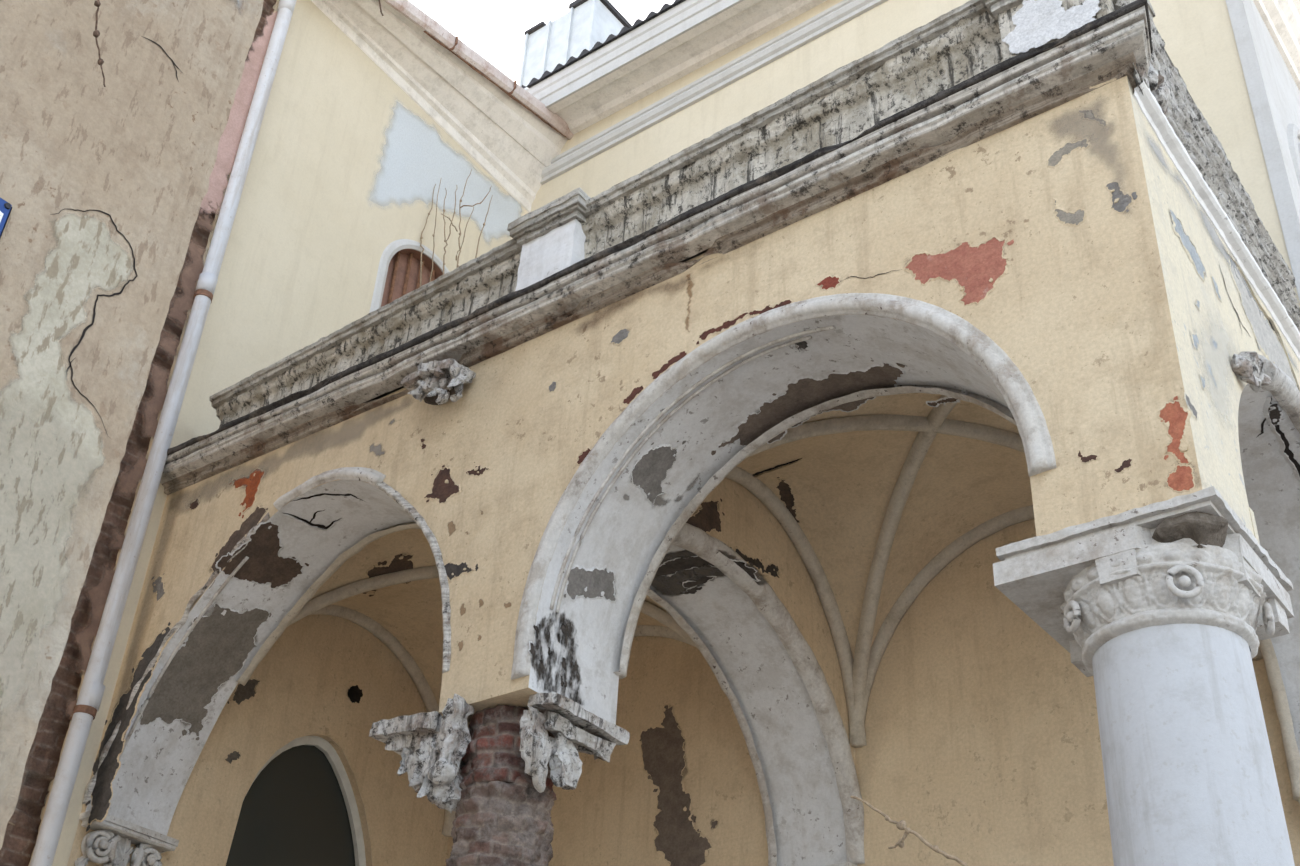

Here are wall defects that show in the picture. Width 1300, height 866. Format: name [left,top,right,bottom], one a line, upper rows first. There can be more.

flaking render [1002,0,1101,54]
peeling [372,103,521,241]
peeling [0,214,132,641]
crack [50,209,138,440]
spalling [711,362,905,455]
spalling [903,236,1014,306]
crack [1218,248,1300,482]
spalling [210,505,309,589]
crack [281,493,363,531]
peeling [528,565,617,705]
spalling [86,602,272,832]
spalling [639,704,718,866]